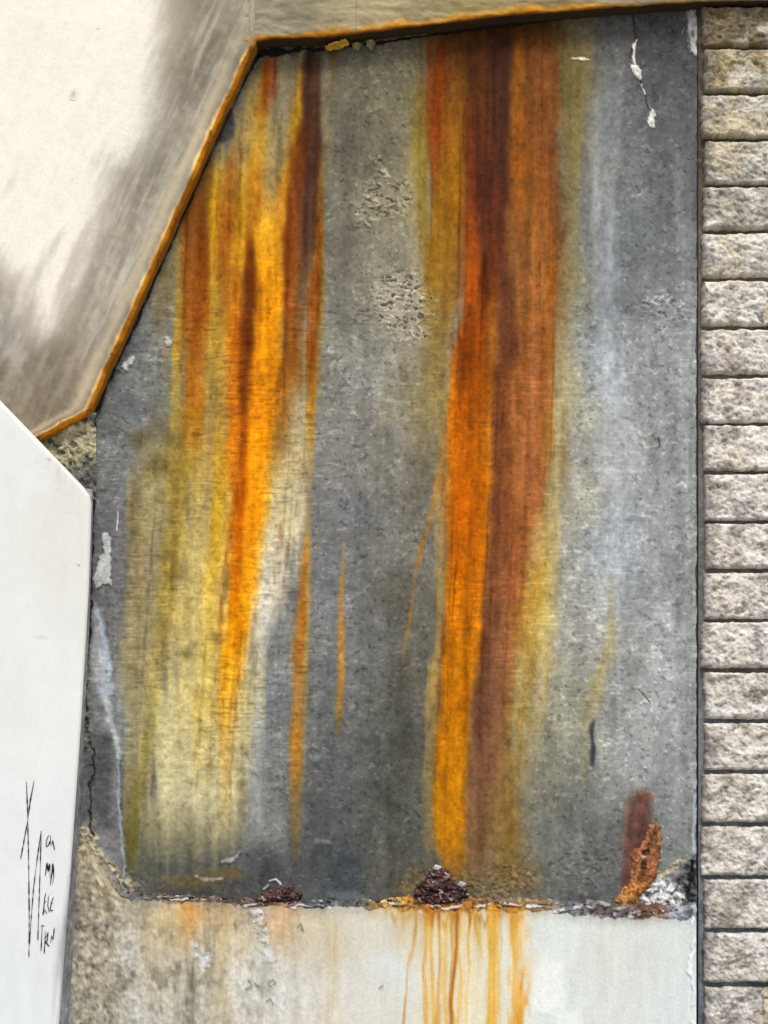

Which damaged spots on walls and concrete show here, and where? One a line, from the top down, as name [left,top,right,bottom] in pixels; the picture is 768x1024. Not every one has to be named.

crack [94,20,559,445]
crack [630,15,657,129]
corrosion [34,0,711,896]
crack [83,483,96,837]
corrosion [384,901,541,1024]